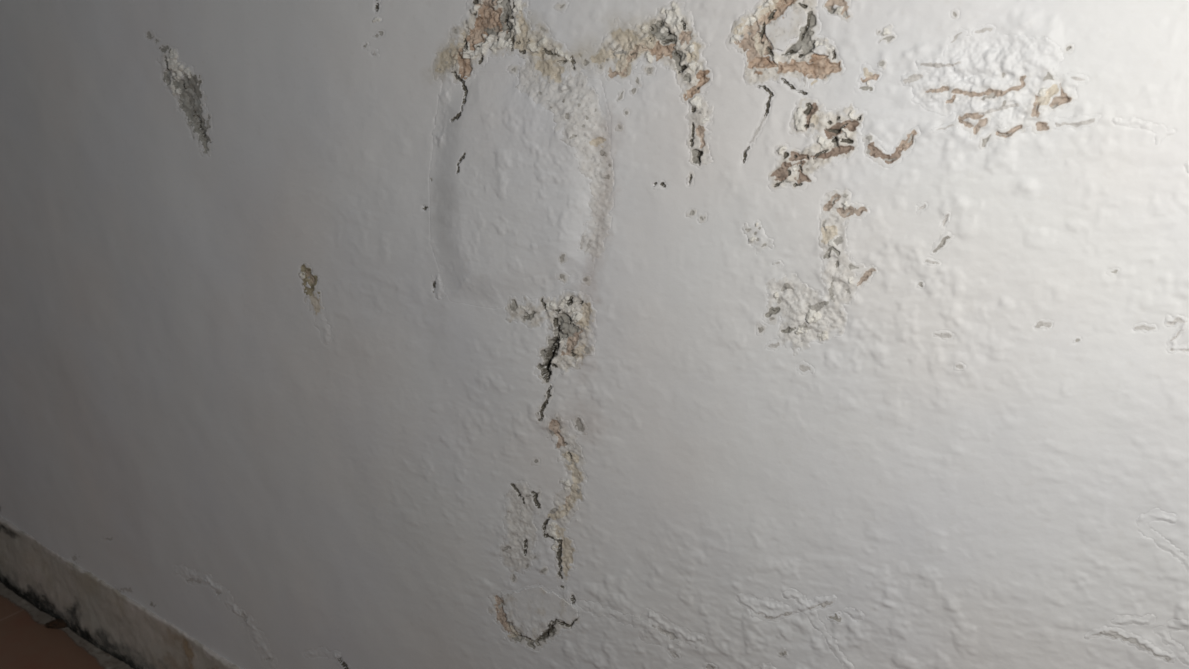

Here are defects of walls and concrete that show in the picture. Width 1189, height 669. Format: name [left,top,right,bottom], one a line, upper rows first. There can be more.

peeling [145,30,213,159]
spalling [725,0,854,86]
peeling [768,8,1101,193]
peeling [298,262,335,345]
spalling [432,0,714,384]
peeling [742,187,878,375]
flaking render [933,214,951,253]
crack [499,383,588,604]
leakage [0,576,139,669]
crack [304,647,351,669]